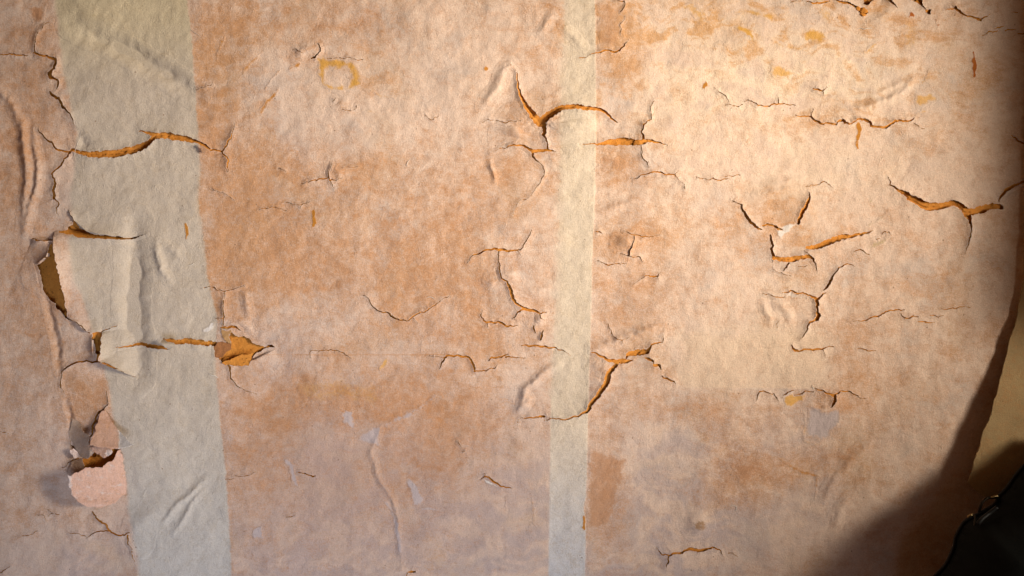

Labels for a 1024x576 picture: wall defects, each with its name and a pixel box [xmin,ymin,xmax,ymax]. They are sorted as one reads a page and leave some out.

crack [0,17,366,471]
crack [426,60,974,430]
crack [885,174,1024,258]
peeling [67,410,134,508]
crack [653,543,741,571]